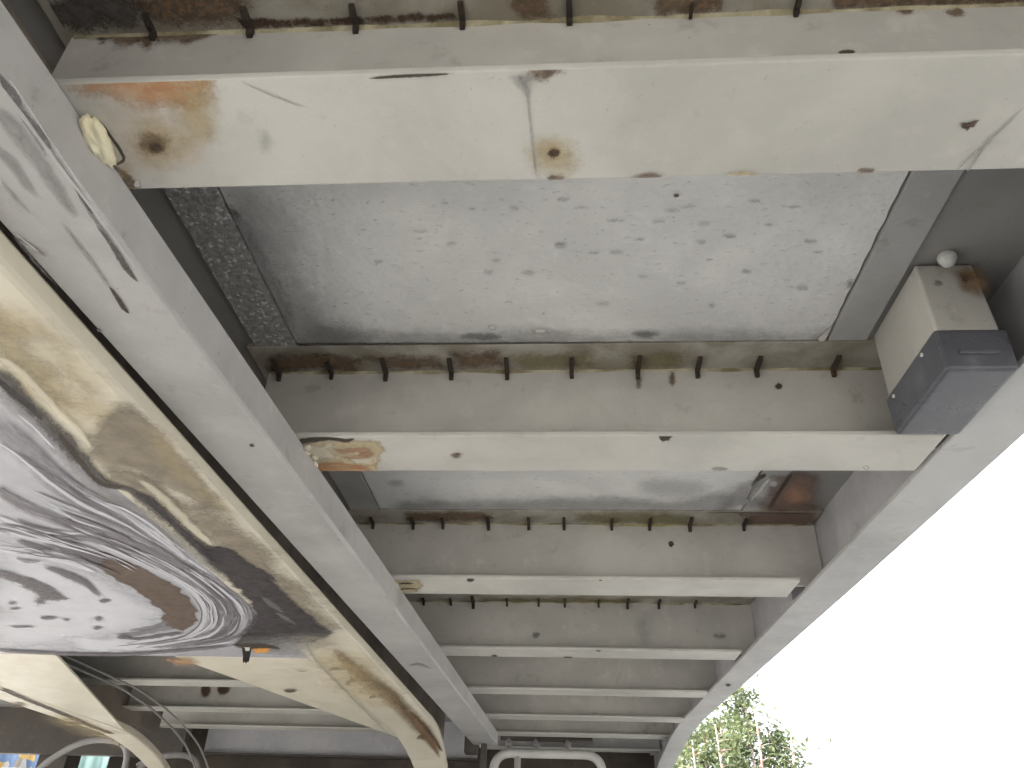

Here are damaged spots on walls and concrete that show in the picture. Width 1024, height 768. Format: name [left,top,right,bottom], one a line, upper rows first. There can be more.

rust [50,0,456,47]
rust [655,0,722,16]
rust [832,0,1024,16]
rust [84,80,207,110]
crack [519,78,536,168]
rust [140,134,164,153]
peeling [0,74,138,282]
rust [270,351,590,373]
peeling [299,437,385,471]
leakage [0,328,334,656]
rust [710,474,818,525]
rust [405,512,493,522]